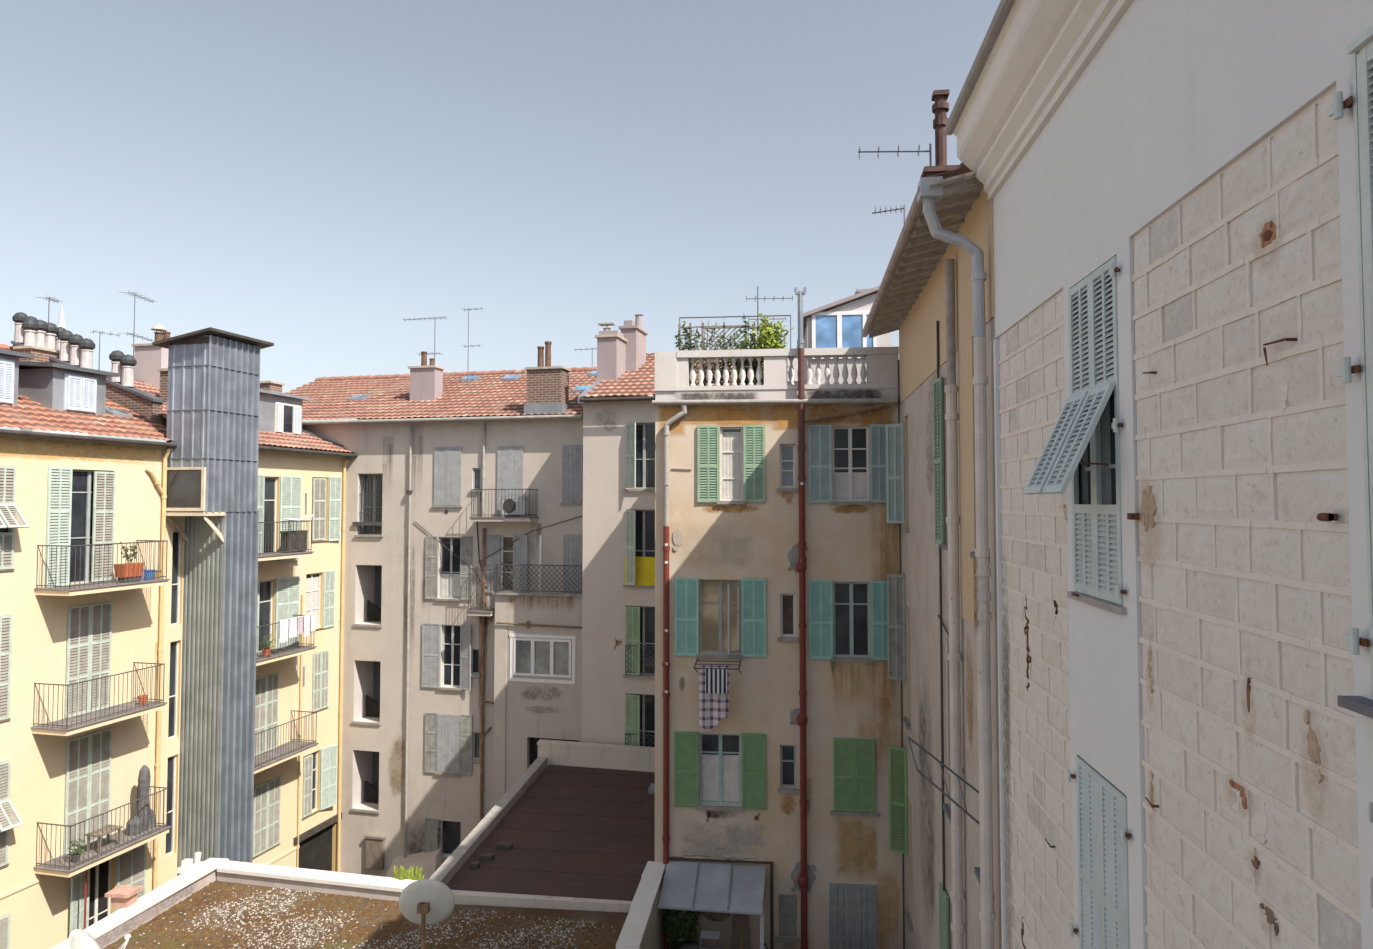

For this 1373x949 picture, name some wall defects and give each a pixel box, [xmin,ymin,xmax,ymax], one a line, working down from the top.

rust [1229,779,1247,809]